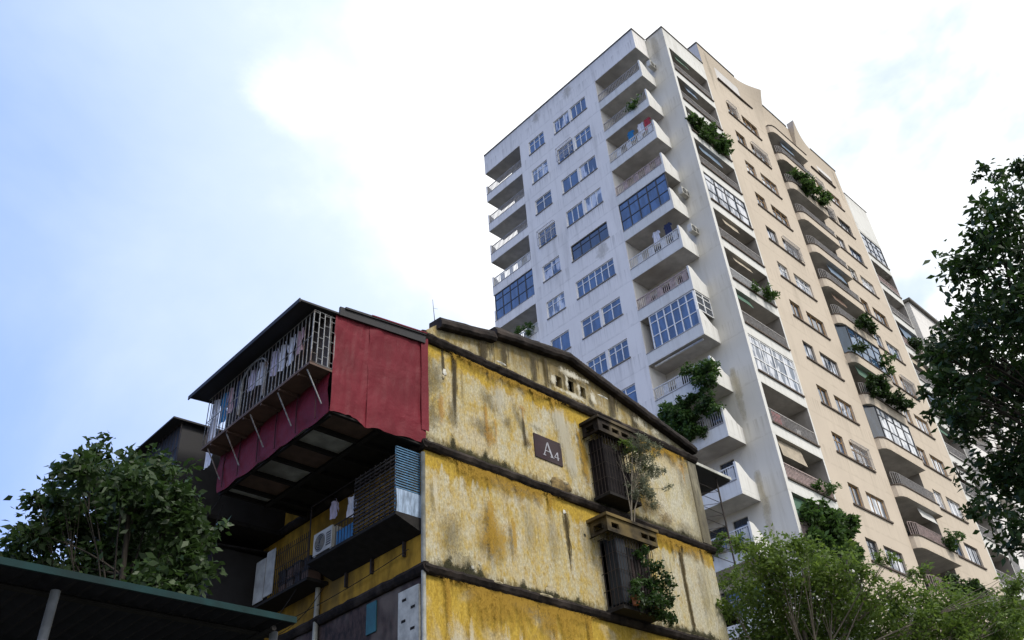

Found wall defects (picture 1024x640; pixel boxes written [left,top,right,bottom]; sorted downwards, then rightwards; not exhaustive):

damp [431,340,590,483]
damp [645,442,684,465]
damp [447,459,557,561]
damp [639,496,707,560]
damp [443,579,593,640]